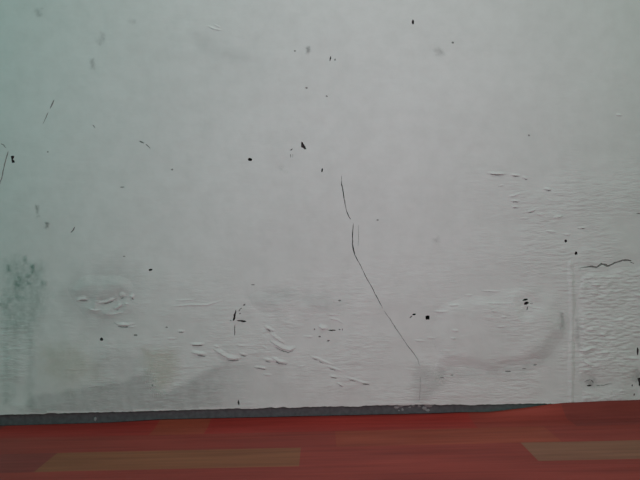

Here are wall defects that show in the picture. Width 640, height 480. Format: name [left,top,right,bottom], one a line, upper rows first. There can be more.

crack [341,176,421,398]
crack [581,259,634,268]